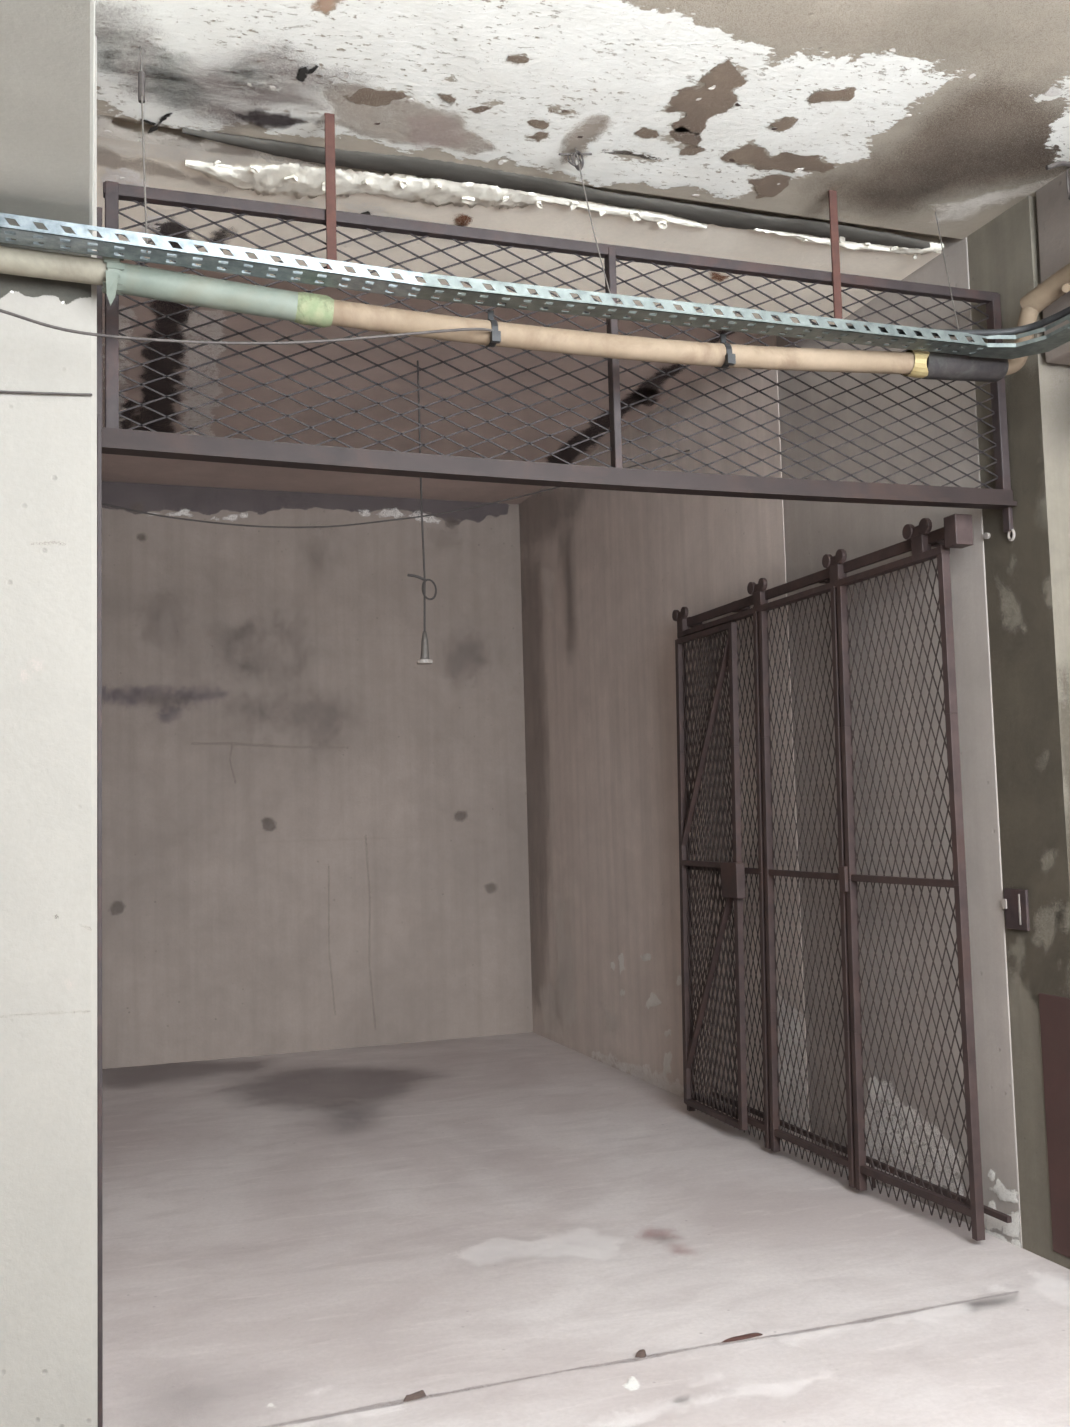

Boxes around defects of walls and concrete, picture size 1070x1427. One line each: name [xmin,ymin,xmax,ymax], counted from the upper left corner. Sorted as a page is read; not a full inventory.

leakage [95,0,379,136]
peeling [95,0,976,200]
leakage [621,0,1070,228]
peeling [135,214,172,234]
peeling [274,198,323,227]
peeling [342,201,456,245]
leakage [982,354,1070,1012]